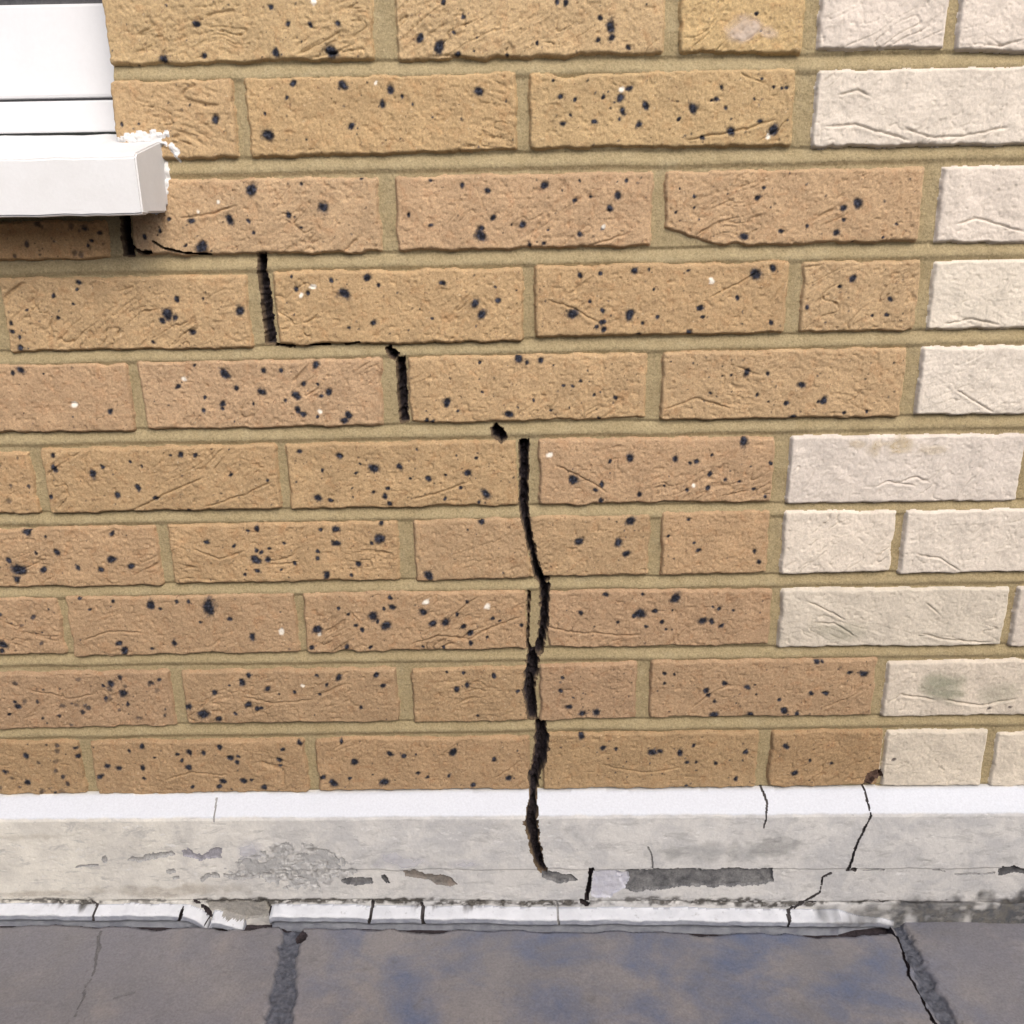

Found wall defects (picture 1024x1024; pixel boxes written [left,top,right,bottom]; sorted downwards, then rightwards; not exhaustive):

crack [119,215,212,257]
crack [256,252,410,424]
crack [490,422,551,873]
crack [759,785,769,829]
peeling [127,842,390,893]
crack [346,899,460,934]
spalling [591,867,774,898]
crack [634,930,737,938]
crack [764,783,937,1024]
crack [932,868,995,876]
crack [54,899,296,1017]